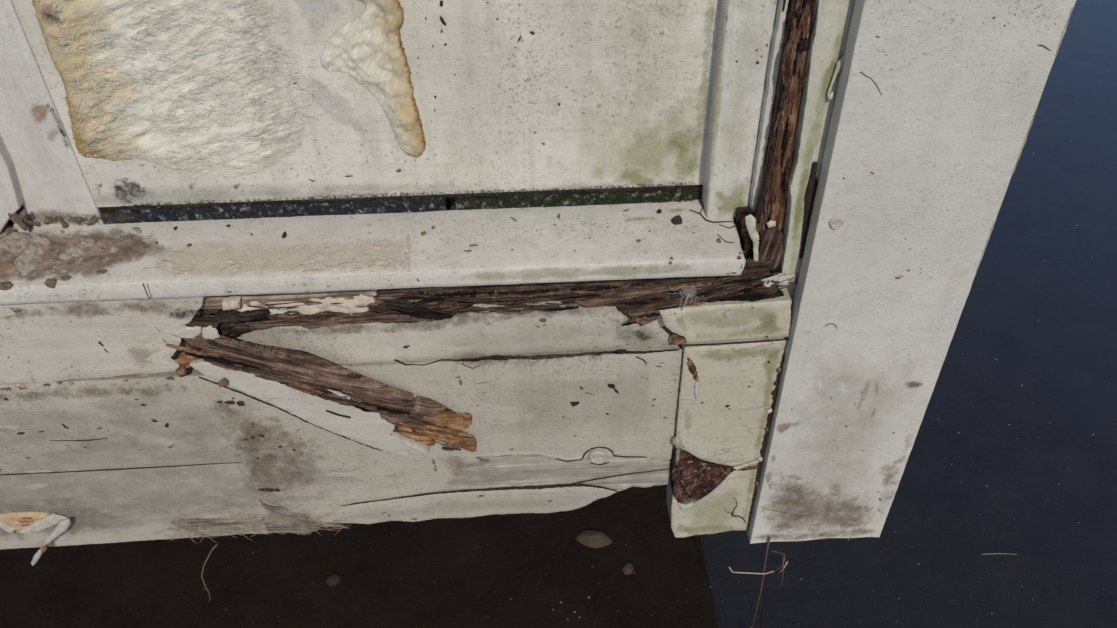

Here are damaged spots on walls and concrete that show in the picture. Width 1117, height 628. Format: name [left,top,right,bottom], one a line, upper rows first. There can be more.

peeling [761,272,798,287]
peeling [232,286,377,315]
peeling [155,325,220,343]
peeling [671,333,687,345]
peeling [687,358,704,404]
peeling [217,378,259,418]
peeling [409,396,441,417]
peeling [0,510,71,566]